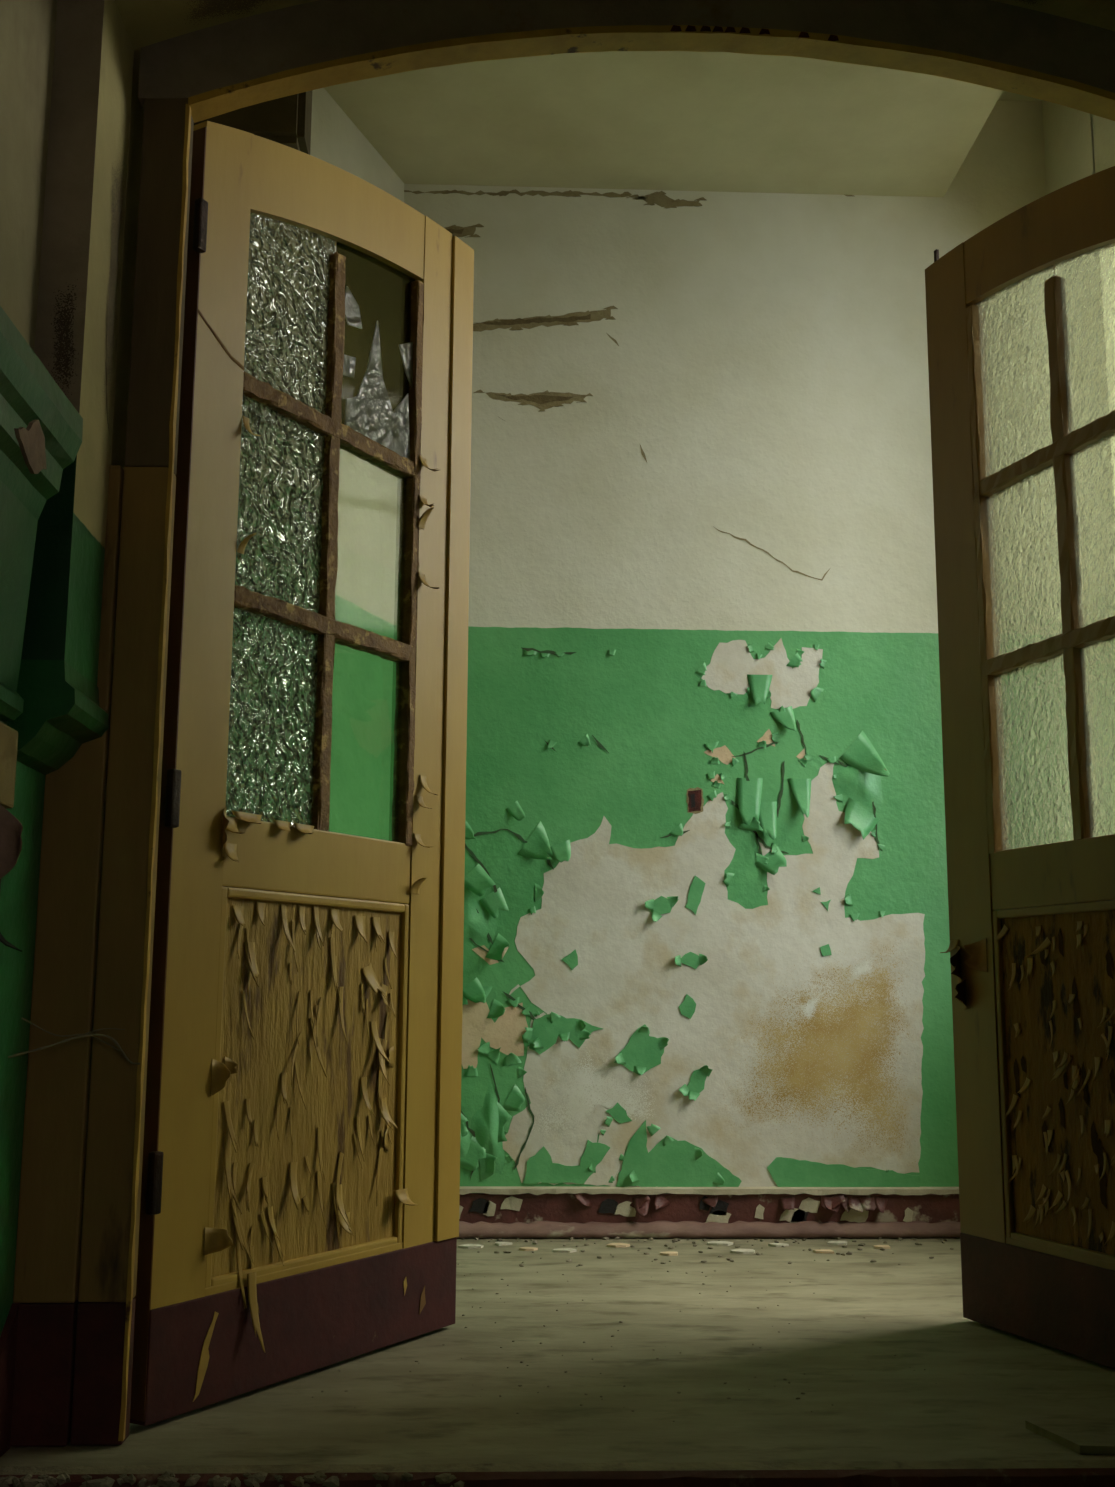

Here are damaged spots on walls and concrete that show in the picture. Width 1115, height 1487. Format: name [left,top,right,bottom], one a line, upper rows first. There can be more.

spalling [473,306,618,332]
spalling [474,390,593,412]
peeling [14,420,47,474]
crack [713,526,830,581]
peeling [695,638,827,749]
peeling [459,731,1009,1223]
peeling [1007,921,1088,992]
water stain [718,928,921,1166]
peeling [1023,977,1115,1244]